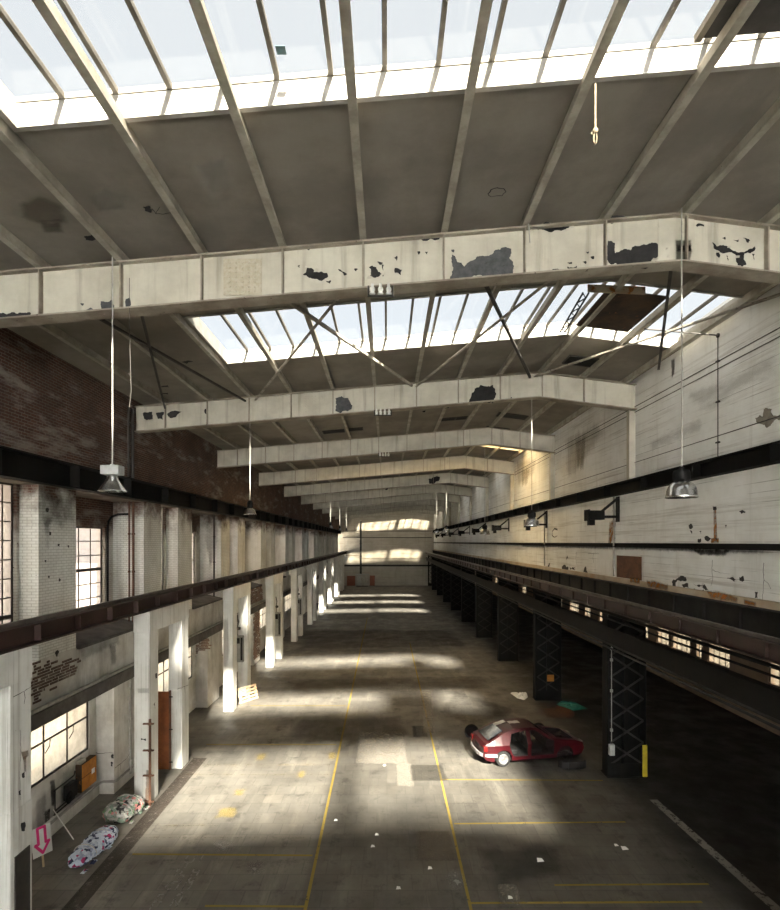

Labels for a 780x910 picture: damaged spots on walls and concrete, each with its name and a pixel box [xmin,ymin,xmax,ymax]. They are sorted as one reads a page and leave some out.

peeling [298,265,331,283]
peeling [367,256,402,279]
peeling [450,247,518,279]
peeling [607,239,670,269]
peeling [712,237,755,266]
peeling [142,411,180,420]
peeling [335,396,354,413]
peeling [469,385,496,404]
corrosion [711,507,719,543]
peeling [672,576,708,591]